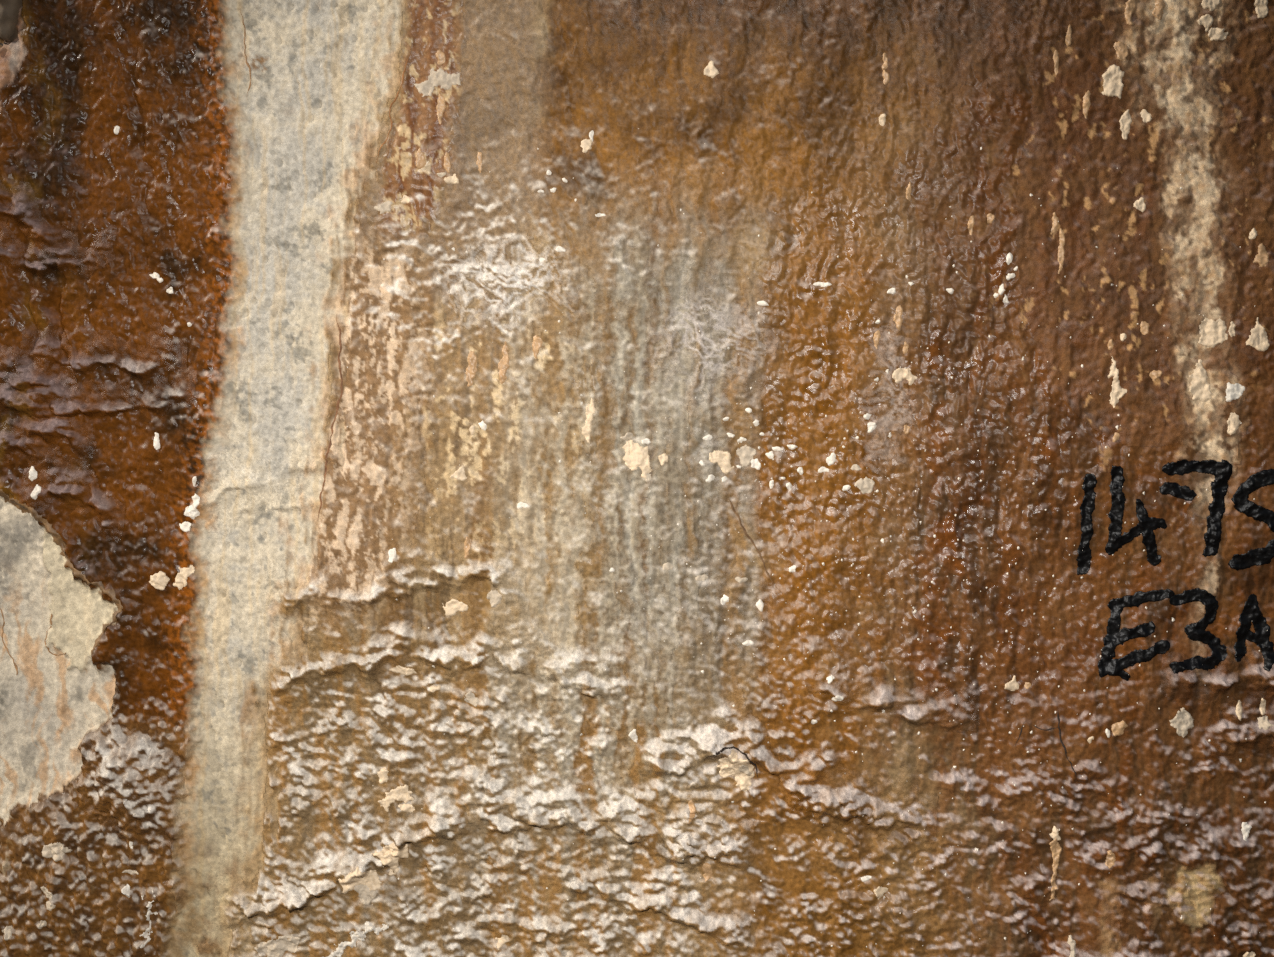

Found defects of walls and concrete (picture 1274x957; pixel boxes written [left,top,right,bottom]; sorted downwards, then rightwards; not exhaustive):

peeling [414,49,461,124]
leakage [1011,0,1274,476]
rust [0,0,235,769]
leakage [162,0,1084,957]
leakage [1187,474,1234,533]
peeling [442,599,468,616]
leakage [1192,559,1221,623]
spalling [0,466,123,826]
peeling [42,842,72,862]
rust [0,772,186,957]
peeling [121,870,139,898]
leakage [1140,861,1226,934]